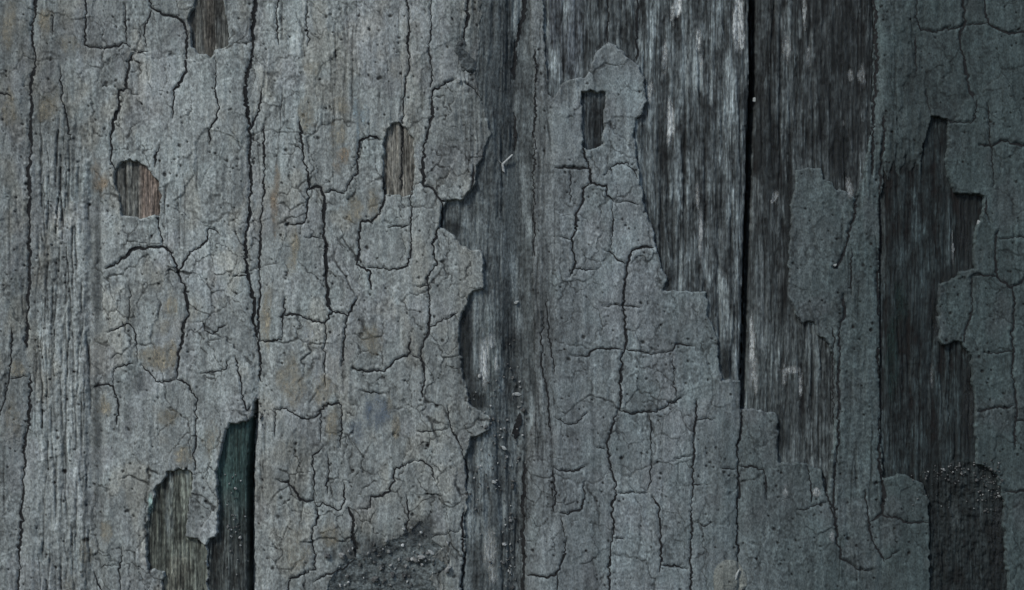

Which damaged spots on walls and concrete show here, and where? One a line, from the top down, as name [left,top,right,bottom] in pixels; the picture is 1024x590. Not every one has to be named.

crack [0,0,71,590]
peeling [115,160,162,219]
peeling [147,412,258,590]
peeling [189,0,229,58]
crack [84,0,481,590]
peeling [383,123,415,197]
crack [511,0,713,590]
peeling [440,0,874,590]
crack [722,407,768,562]
peeling [879,117,1007,590]
crack [914,0,1024,447]